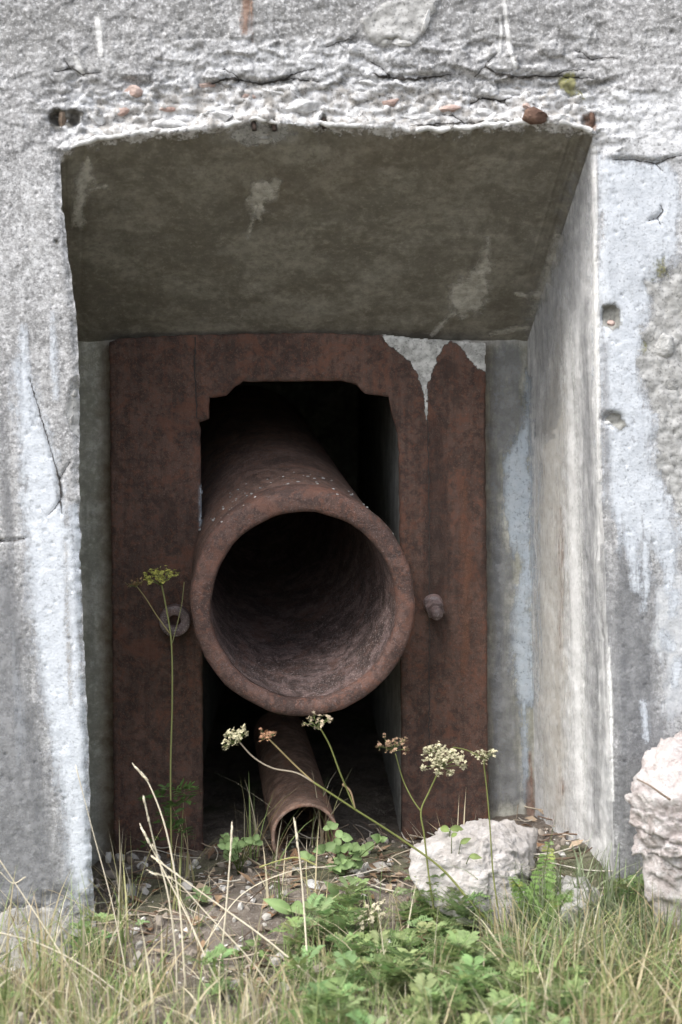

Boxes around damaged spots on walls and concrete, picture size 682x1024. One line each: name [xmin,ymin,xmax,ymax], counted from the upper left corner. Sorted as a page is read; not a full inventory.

crack [54,61,98,76]
crack [211,68,319,85]
spalling [51,76,601,164]
crack [370,50,618,126]
crack [614,155,682,171]
water stain [247,178,281,232]
water stain [430,237,494,337]
crack [29,379,71,515]
peeling [588,152,682,721]
water stain [489,146,663,883]
peeling [640,701,649,742]